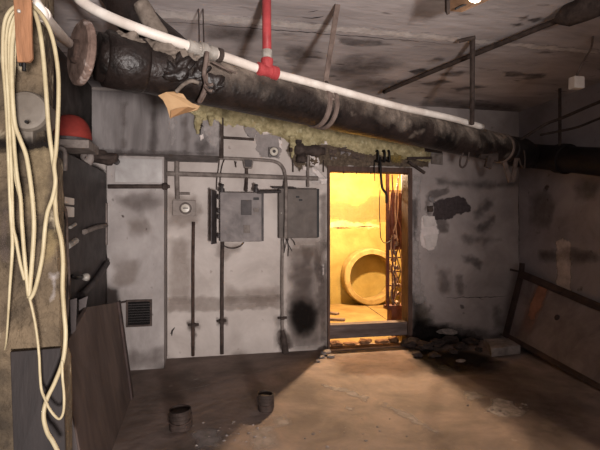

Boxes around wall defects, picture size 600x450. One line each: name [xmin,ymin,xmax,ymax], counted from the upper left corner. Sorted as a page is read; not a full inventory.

spalling [244,127,429,184]
spalling [413,177,471,304]
water stain [412,304,481,342]